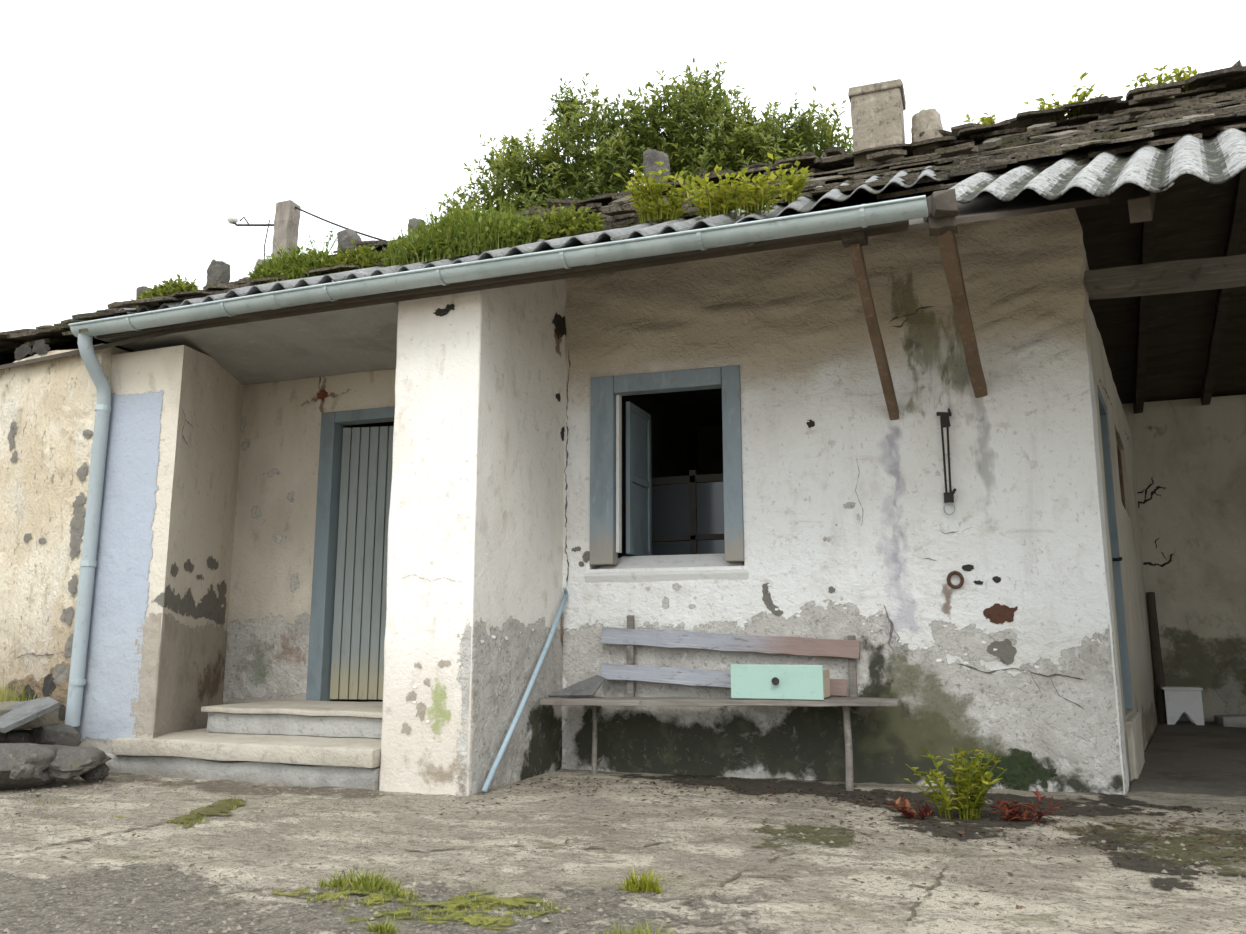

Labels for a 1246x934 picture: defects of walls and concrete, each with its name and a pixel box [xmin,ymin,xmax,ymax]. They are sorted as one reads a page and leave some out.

corrosion [307,379,342,413]
crack [1143,538,1173,567]
peeling [130,556,310,737]
peeling [401,662,430,735]
leakage [520,637,1013,789]
peeling [438,583,1127,796]
crack [957,663,1085,710]
leakage [1153,628,1246,694]
leakage [1033,741,1131,793]